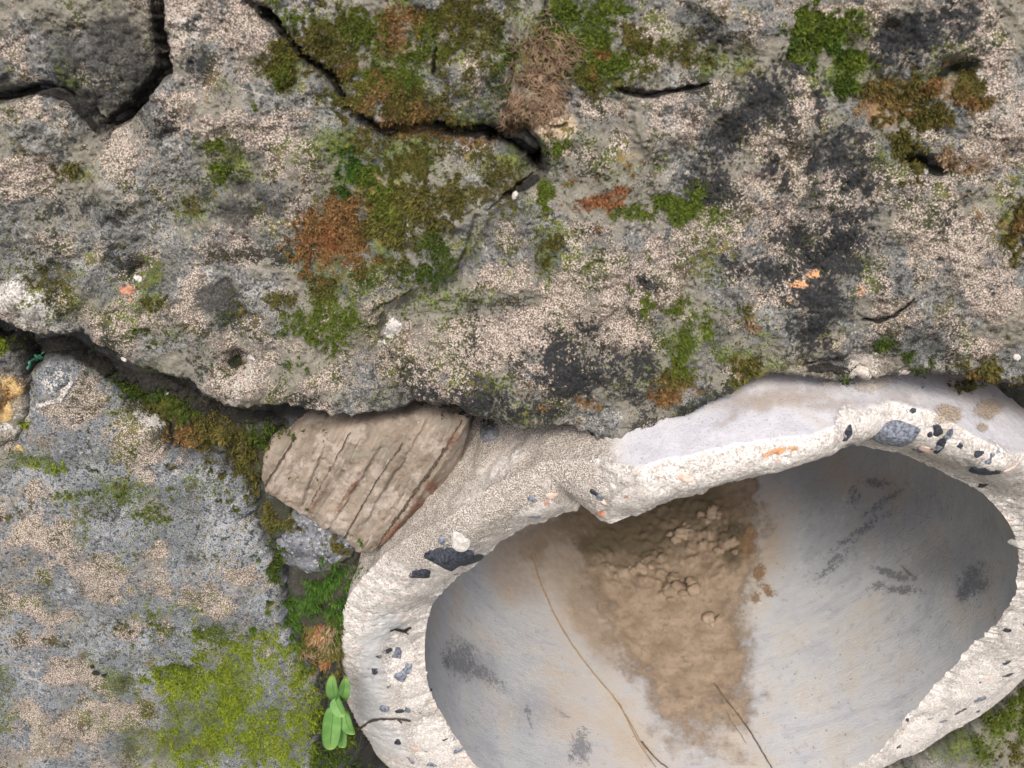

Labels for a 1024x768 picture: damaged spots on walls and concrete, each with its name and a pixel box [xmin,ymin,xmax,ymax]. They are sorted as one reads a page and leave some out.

crack [0,0,162,133]
crack [430,51,438,75]
crack [617,83,707,97]